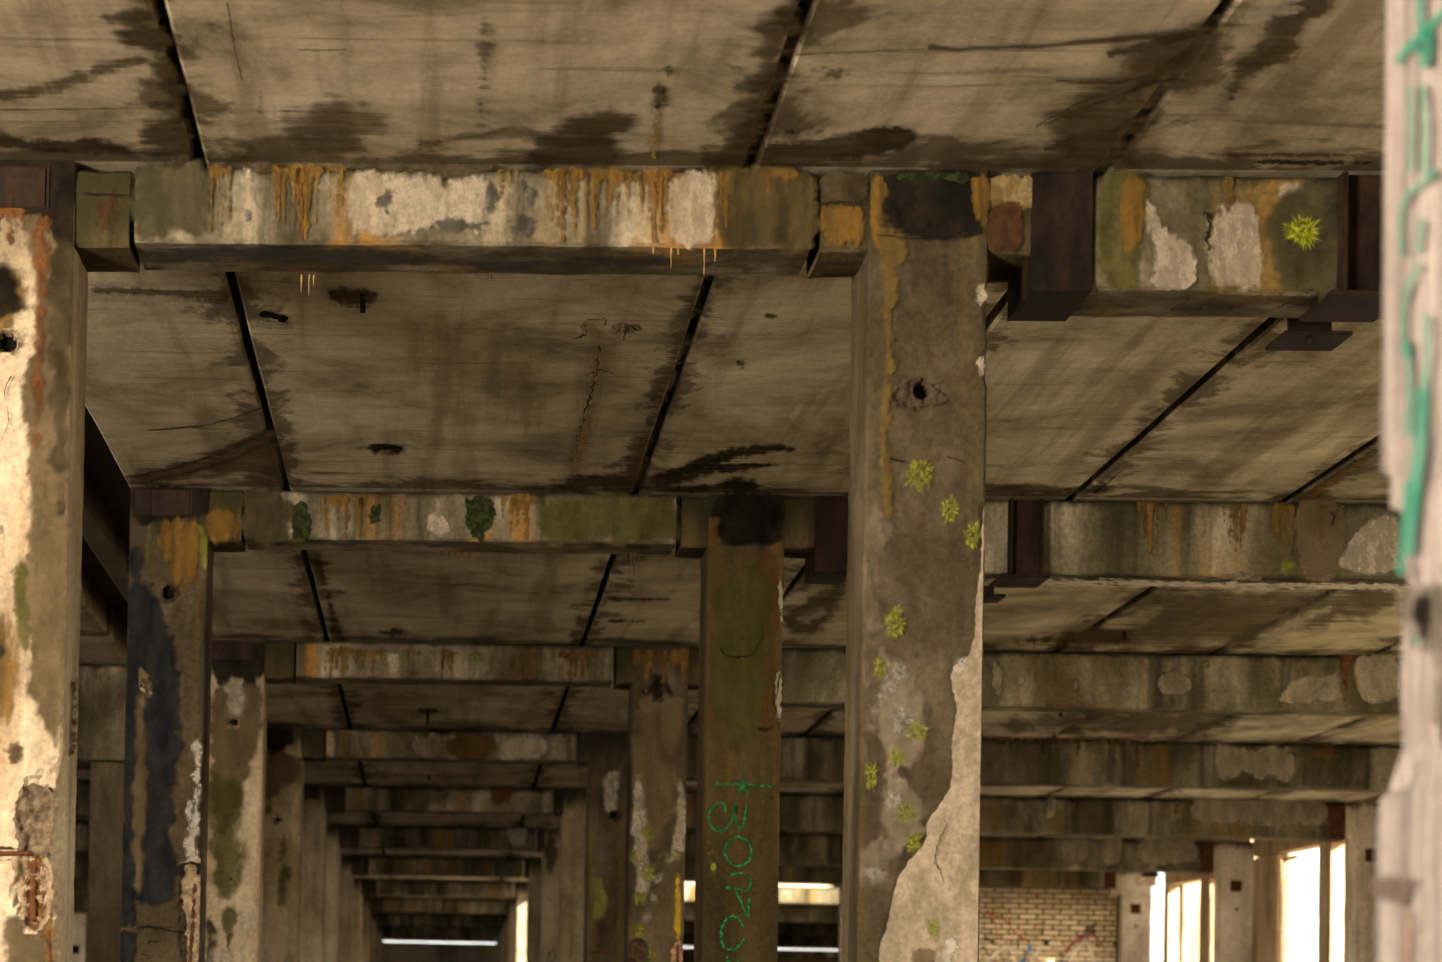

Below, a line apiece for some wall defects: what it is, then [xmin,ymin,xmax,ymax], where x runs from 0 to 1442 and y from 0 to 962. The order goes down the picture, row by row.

rust [543,166,673,244]
damp [678,0,1333,254]
peeling [1145,201,1261,291]
damp [0,0,673,744]
spalling [0,783,55,962]
damp [132,690,148,893]
damp [205,919,230,962]
peeling [879,500,1003,962]